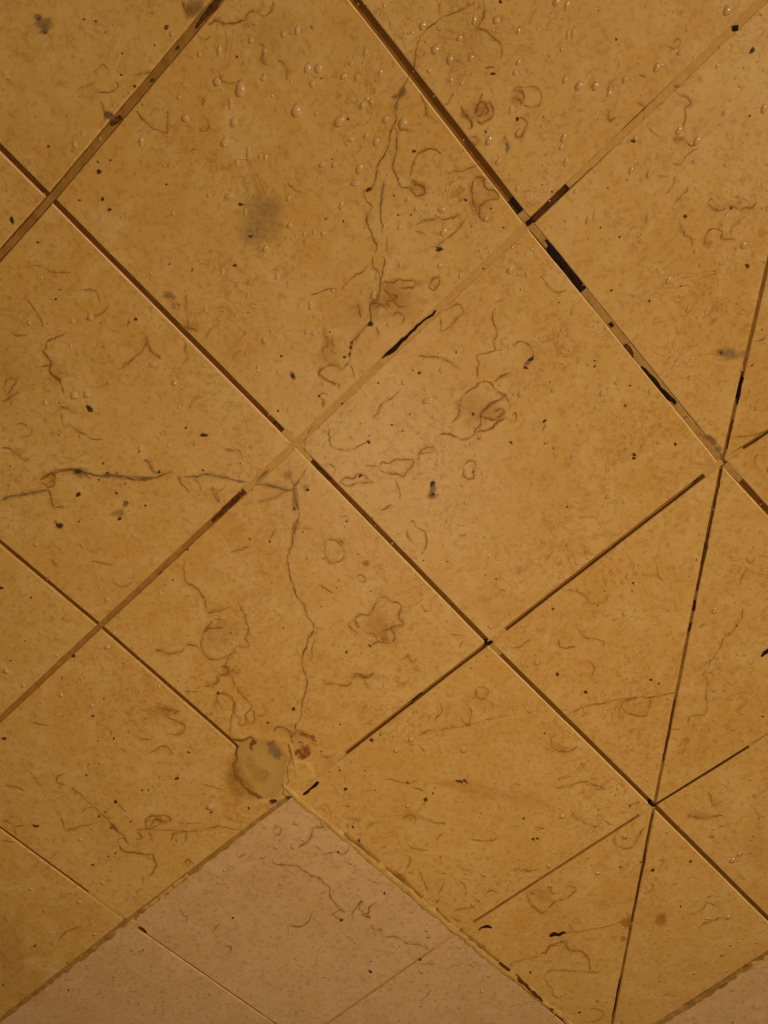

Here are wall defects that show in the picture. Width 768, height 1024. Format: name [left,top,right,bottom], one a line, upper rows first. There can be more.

crack [3,470,165,508]
crack [194,471,314,728]